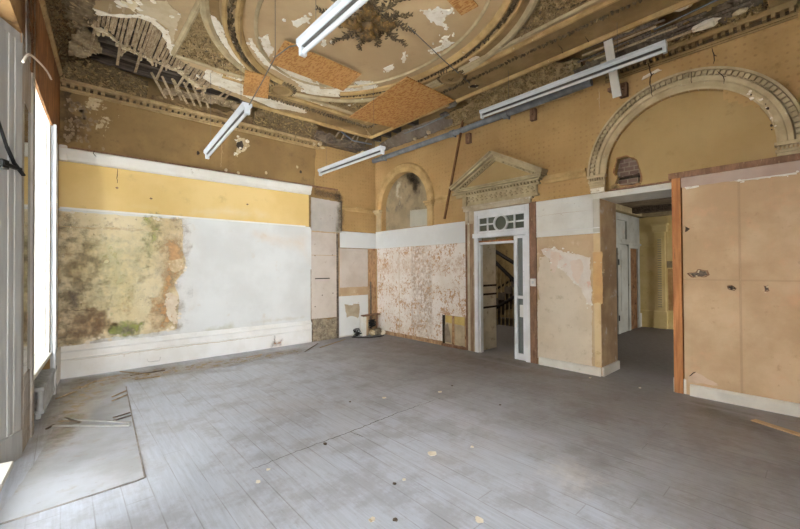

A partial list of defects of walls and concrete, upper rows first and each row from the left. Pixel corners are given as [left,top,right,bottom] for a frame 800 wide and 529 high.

flaking render [61,0,307,113]
flaking render [234,135,250,157]
peeling [420,6,455,55]
flaking render [747,90,777,130]
water stain [58,199,225,347]
flaking render [537,233,595,366]